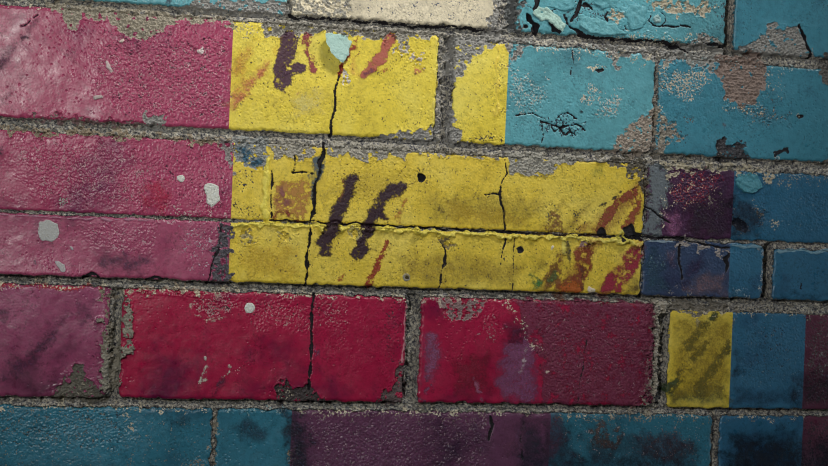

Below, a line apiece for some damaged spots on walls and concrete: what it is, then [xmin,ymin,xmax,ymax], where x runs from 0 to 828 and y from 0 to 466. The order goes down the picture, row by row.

peeling [44,0,439,85]
crack [533,0,722,75]
spalling [438,0,828,109]
peeling [0,110,316,176]
peeling [204,183,220,207]
peeling [327,108,585,177]
crack [269,67,730,390]
peeling [595,106,775,242]
peeling [440,293,487,321]
spalling [39,364,109,406]
spalling [274,378,332,406]